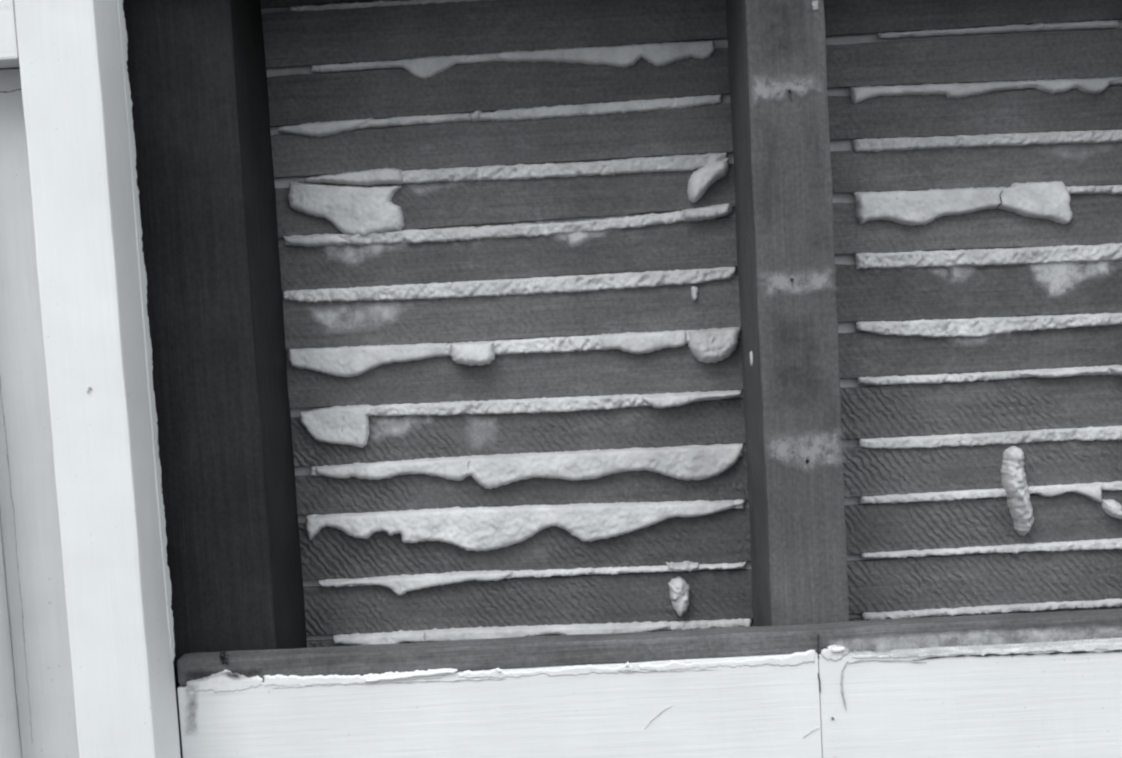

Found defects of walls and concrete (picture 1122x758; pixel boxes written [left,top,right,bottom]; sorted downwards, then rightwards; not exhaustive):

crack [0,377,33,743]
crack [817,633,1122,711]